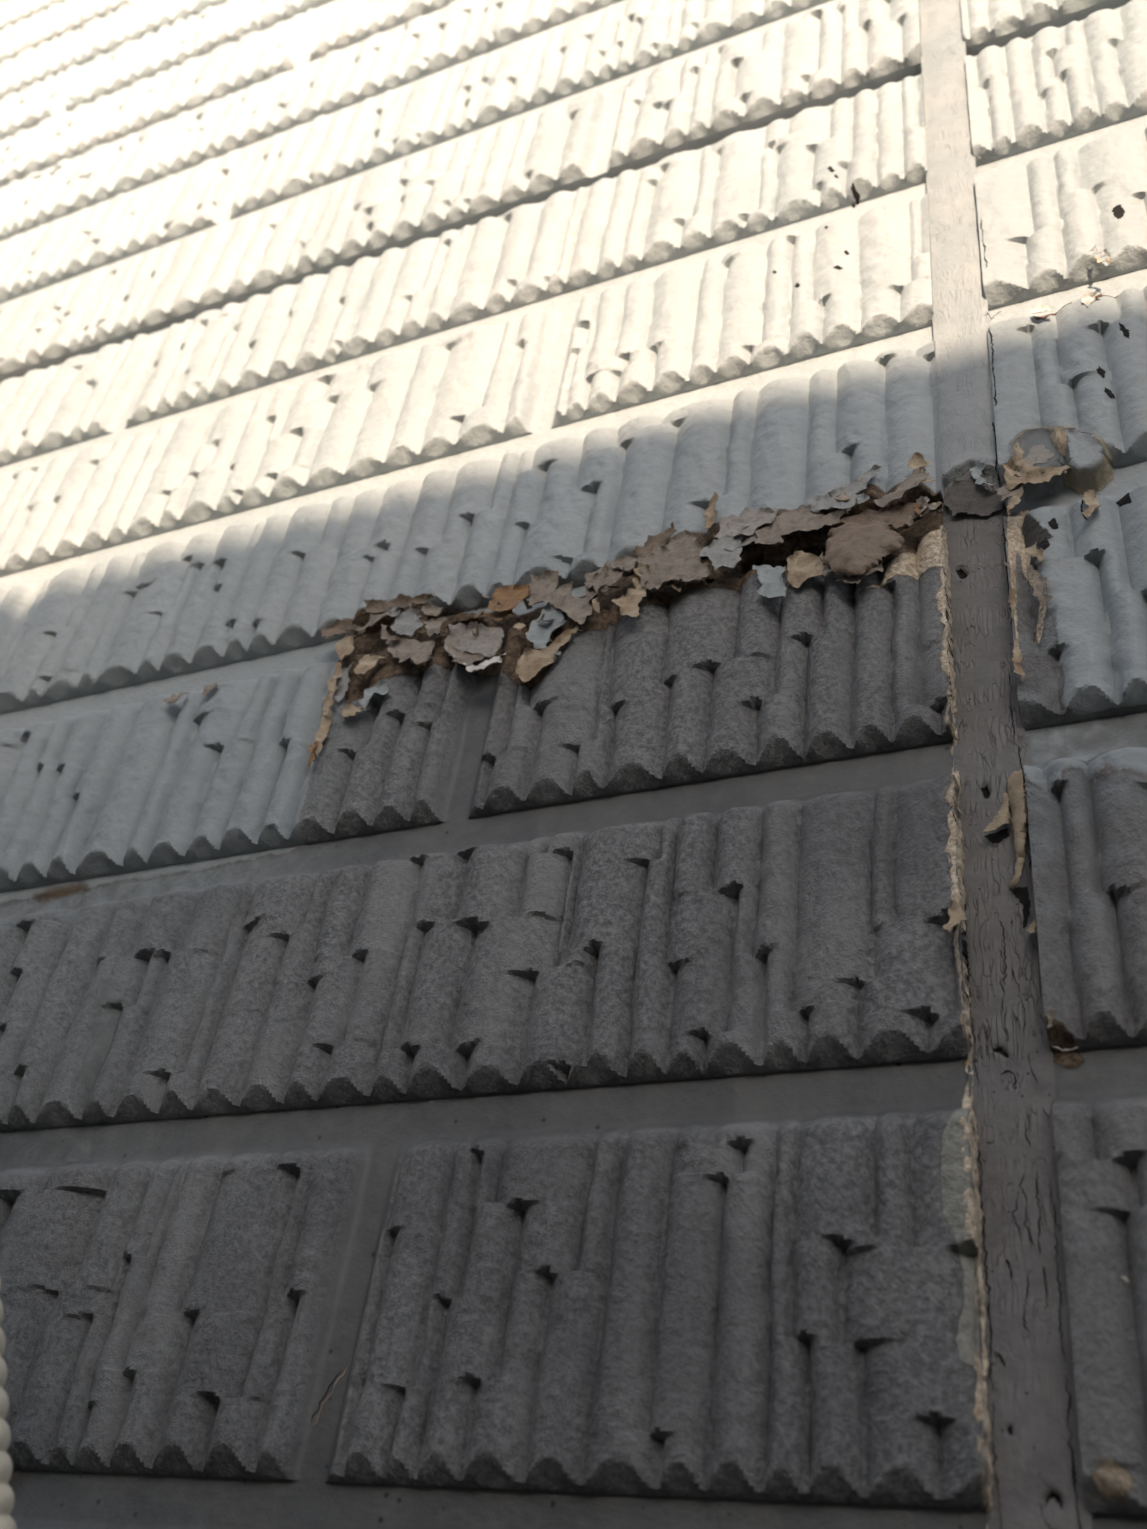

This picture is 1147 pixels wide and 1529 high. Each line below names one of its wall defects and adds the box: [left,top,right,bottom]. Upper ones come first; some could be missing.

peeling [970,457,996,486]
crack [941,531,954,700]
peeling [1004,493,1059,683]
crack [1009,674,1023,769]
peeling [983,769,1038,933]
peeling [308,465,994,1529]
crack [958,876,1037,1085]
spalling [1045,1007,1084,1068]
crack [978,1122,1082,1529]
spalling [1091,1458,1133,1499]